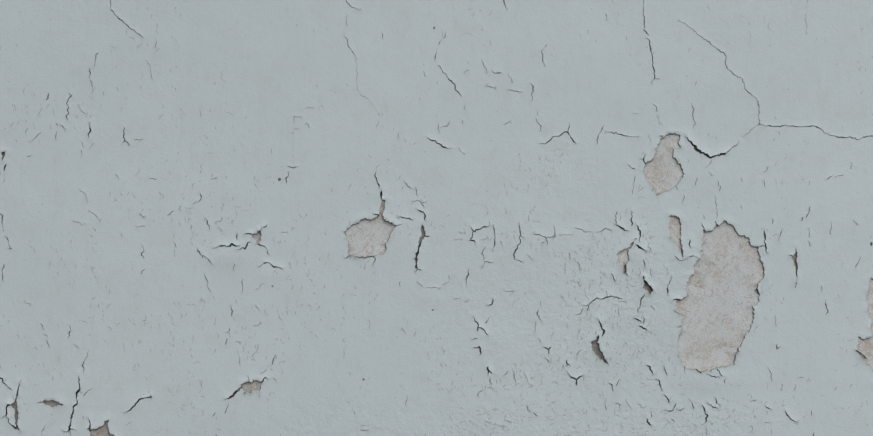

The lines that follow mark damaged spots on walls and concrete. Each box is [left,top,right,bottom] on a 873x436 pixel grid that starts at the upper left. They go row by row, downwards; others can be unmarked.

crack [424,32,575,153]
peeling [643,133,684,196]
crack [682,23,873,216]
peeling [344,172,401,266]
crack [167,178,291,382]
crack [399,165,699,395]
peeling [674,221,766,383]
peeling [855,278,873,371]
crack [41,328,91,436]
peeling [87,420,114,436]
peeling [226,377,267,399]
crack [605,365,720,434]